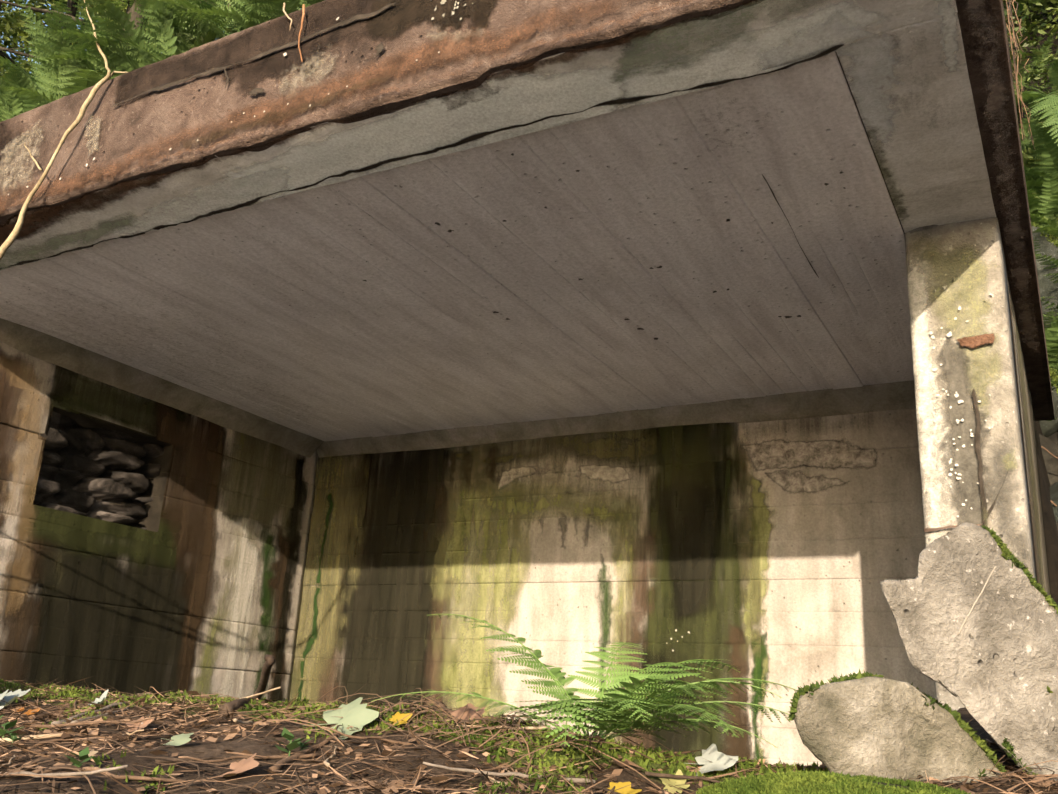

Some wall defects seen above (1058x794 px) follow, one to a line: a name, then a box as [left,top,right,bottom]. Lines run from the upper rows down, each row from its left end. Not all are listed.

corrosion [0,0,712,247]
crack [0,44,844,278]
water stain [0,365,773,760]
spalling [743,440,877,493]
crack [924,389,1015,532]